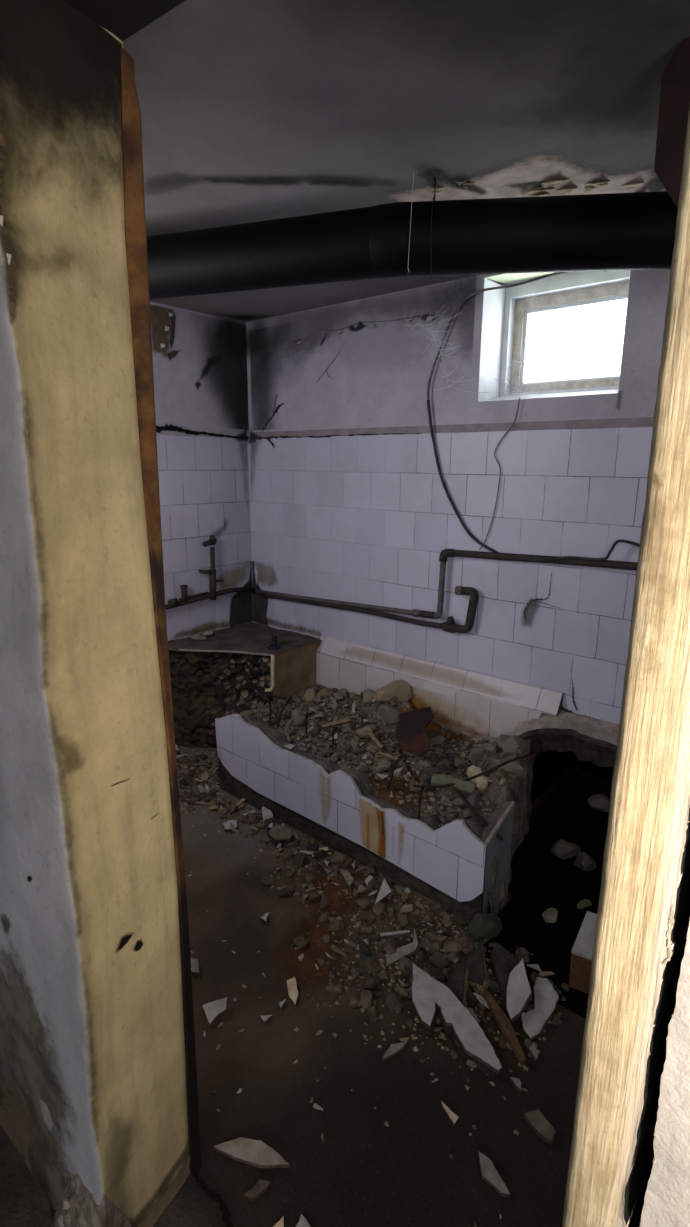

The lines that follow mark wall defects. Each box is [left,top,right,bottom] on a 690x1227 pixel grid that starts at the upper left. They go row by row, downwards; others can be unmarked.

flaking render [392,157,665,202]
crack [156,395,421,448]
rust [395,692,478,756]
rust [360,773,432,858]
crack [193,1171,233,1227]